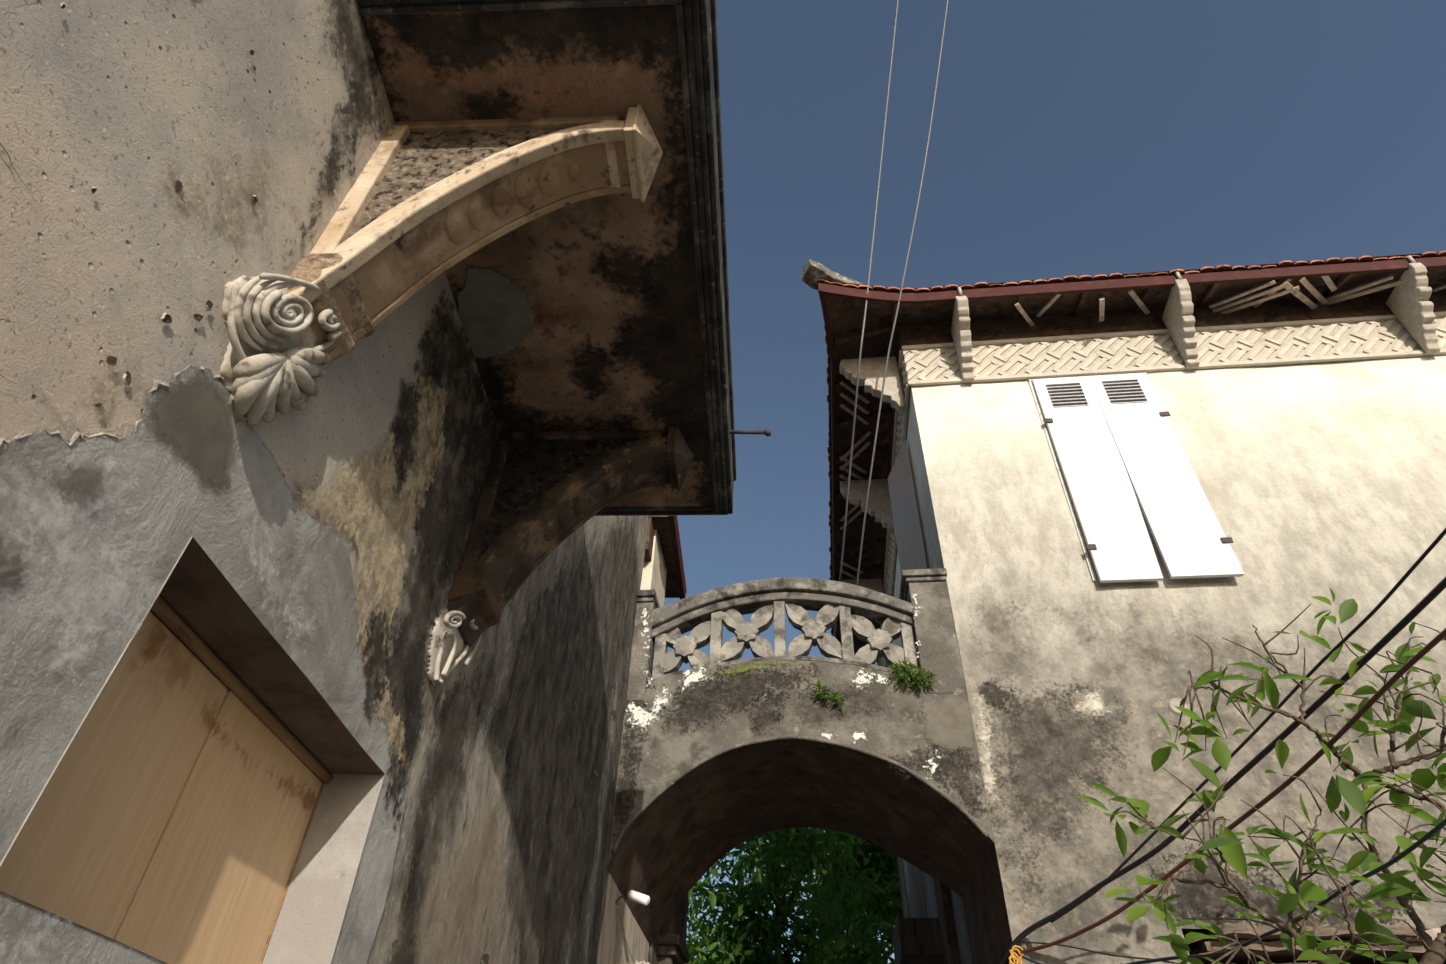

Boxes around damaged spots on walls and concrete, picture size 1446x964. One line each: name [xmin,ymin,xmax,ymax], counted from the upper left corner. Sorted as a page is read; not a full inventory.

crack [0,143,49,218]
spalling [0,364,230,448]
spalling [106,356,131,386]
peeling [245,371,447,776]
water stain [280,0,893,964]
water stain [889,684,1128,903]